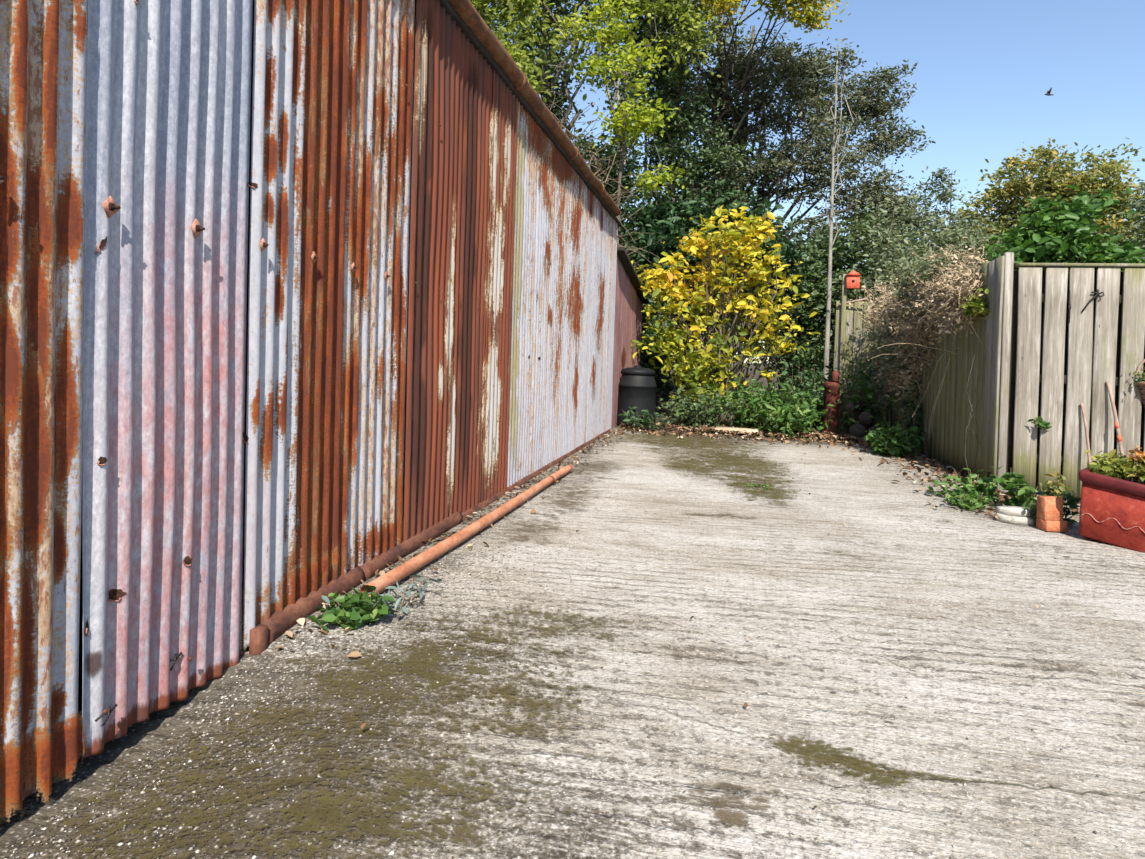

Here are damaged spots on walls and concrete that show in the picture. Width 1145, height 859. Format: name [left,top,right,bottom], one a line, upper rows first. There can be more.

corrosion [0,0,87,823]
corrosion [240,0,414,644]
corrosion [514,95,606,421]